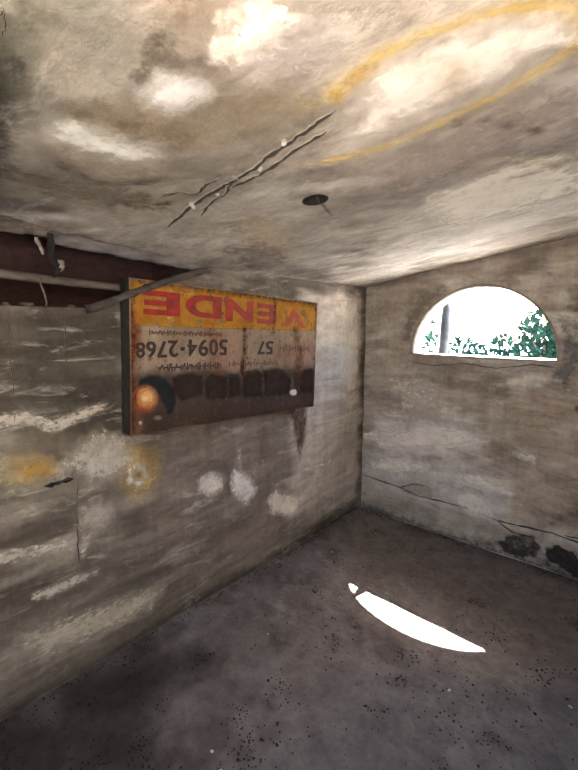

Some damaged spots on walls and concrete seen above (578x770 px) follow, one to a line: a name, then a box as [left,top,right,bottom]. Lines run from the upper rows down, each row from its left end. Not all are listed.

crack [0,0,8,38]
crack [160,110,336,229]
crack [362,474,578,543]